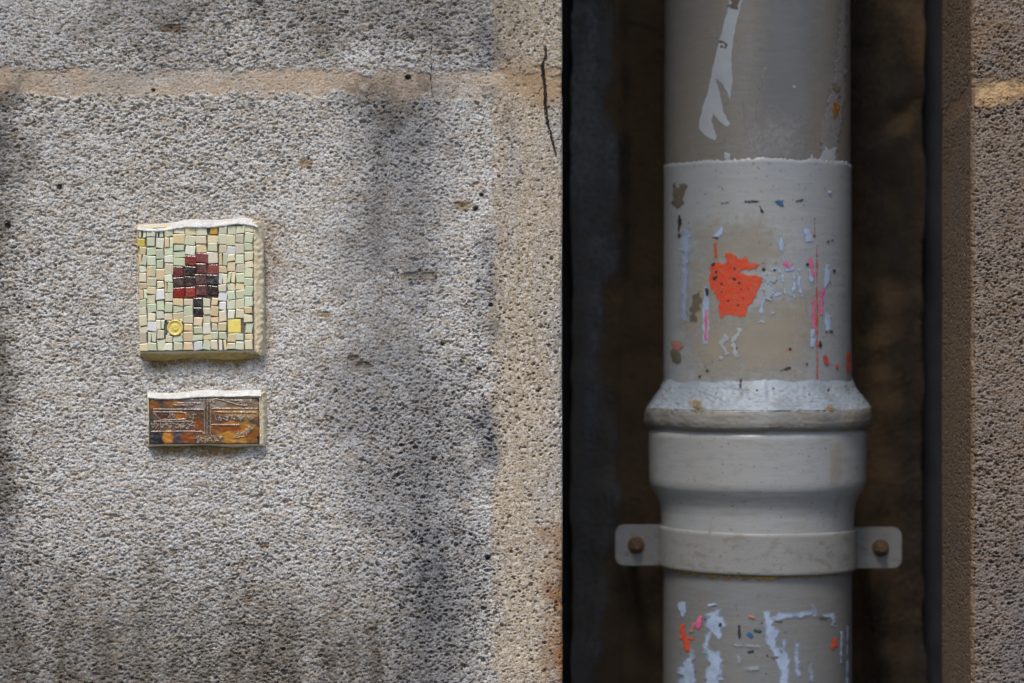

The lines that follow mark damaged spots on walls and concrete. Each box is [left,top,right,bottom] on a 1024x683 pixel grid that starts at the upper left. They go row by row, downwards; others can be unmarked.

crack [539,38,556,153]
peeling [699,0,743,141]
peeling [689,237,749,361]
peeling [678,649,723,683]
peeling [689,603,717,633]
peeling [735,605,843,674]